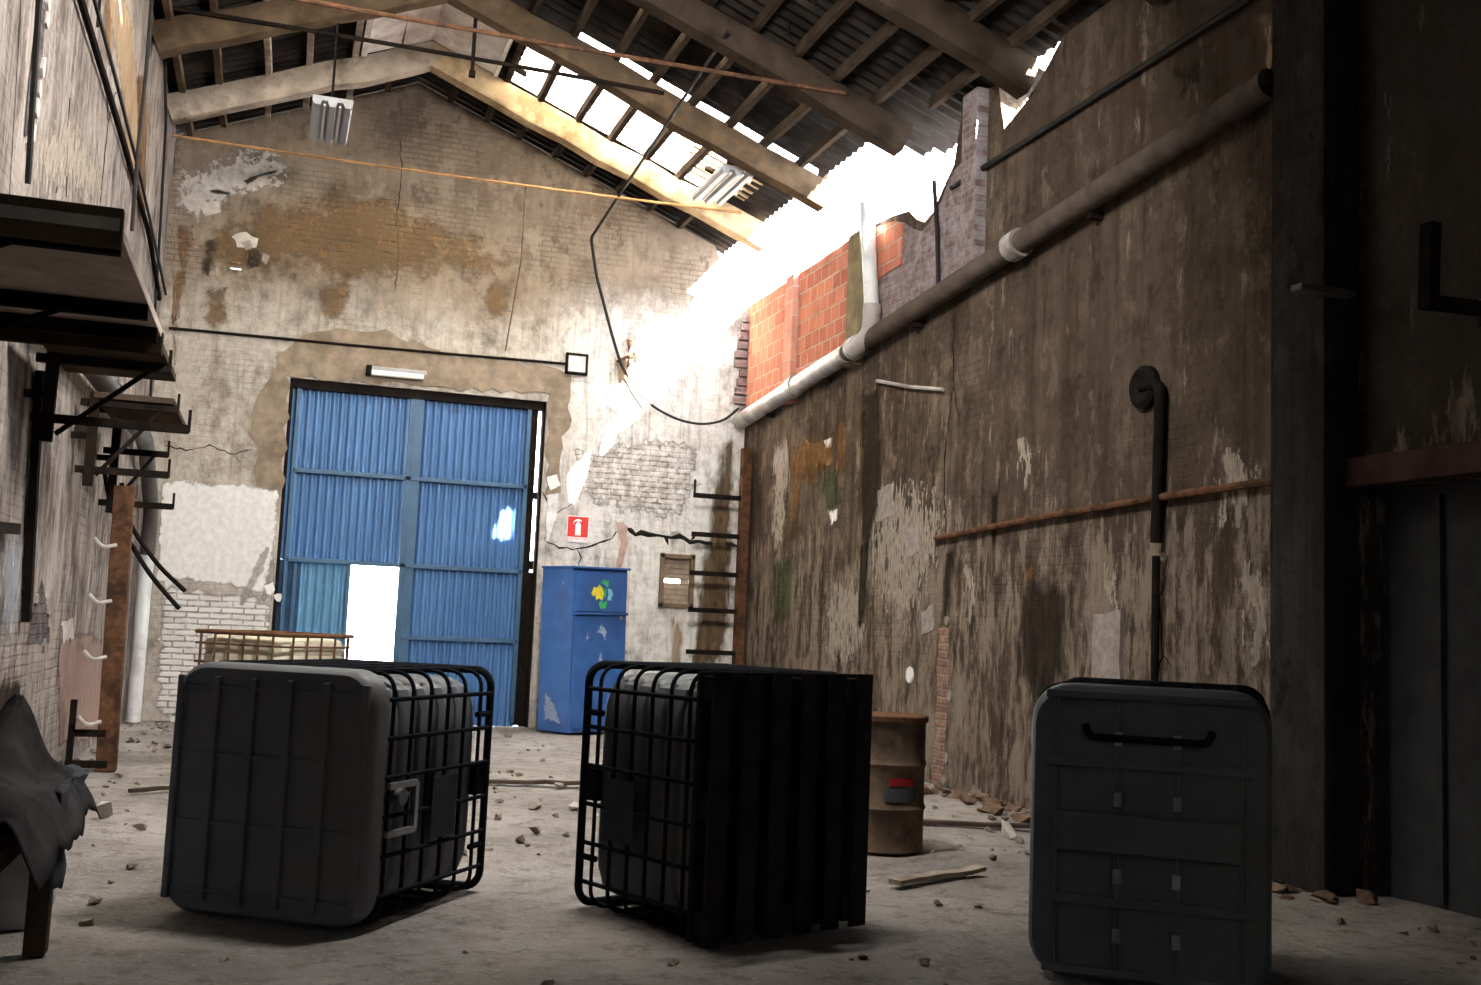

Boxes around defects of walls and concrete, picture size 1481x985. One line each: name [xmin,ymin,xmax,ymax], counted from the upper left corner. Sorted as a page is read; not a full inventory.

peeling [176,148,288,223]
flaking render [156,578,282,722]
flaking render [545,426,697,542]
crack [542,492,737,566]
damp [944,552,954,616]
damp [1015,580,1072,703]